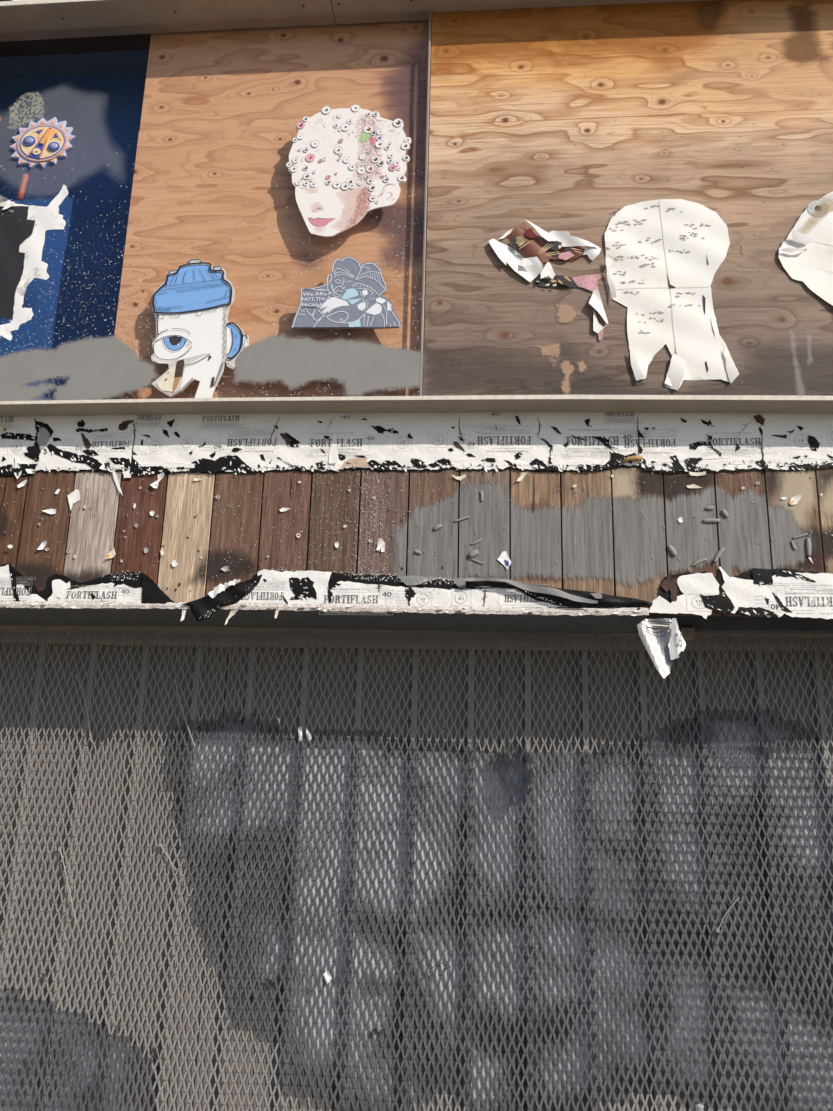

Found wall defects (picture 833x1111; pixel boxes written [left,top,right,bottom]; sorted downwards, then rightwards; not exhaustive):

water stain [785,4,823,62]
peeling [7,425,50,465]
peeling [340,457,392,469]
peeling [791,533,811,557]